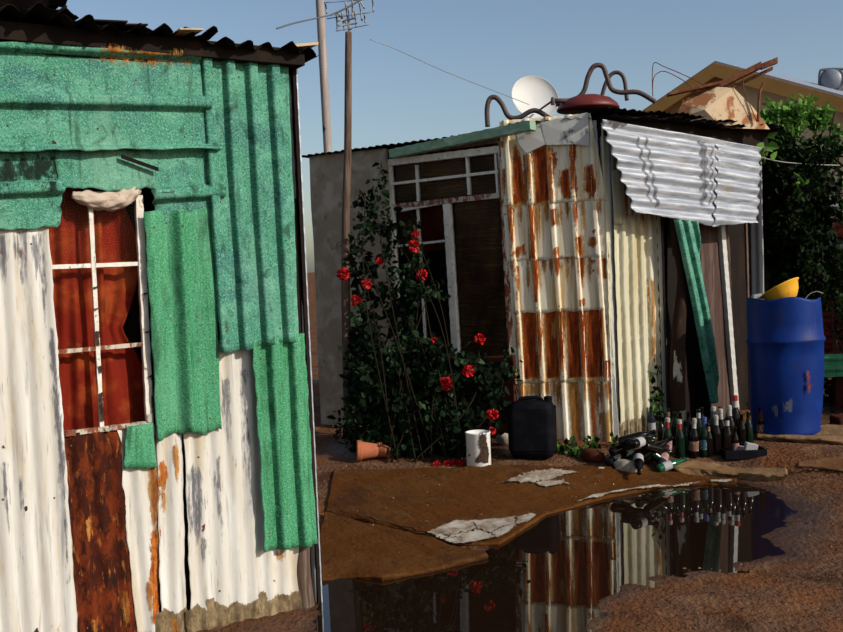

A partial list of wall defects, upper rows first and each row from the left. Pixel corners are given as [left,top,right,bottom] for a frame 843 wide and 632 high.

rust [500,141,610,302]
rust [515,298,612,442]
rust [146,445,180,624]
leakage [155,590,302,632]